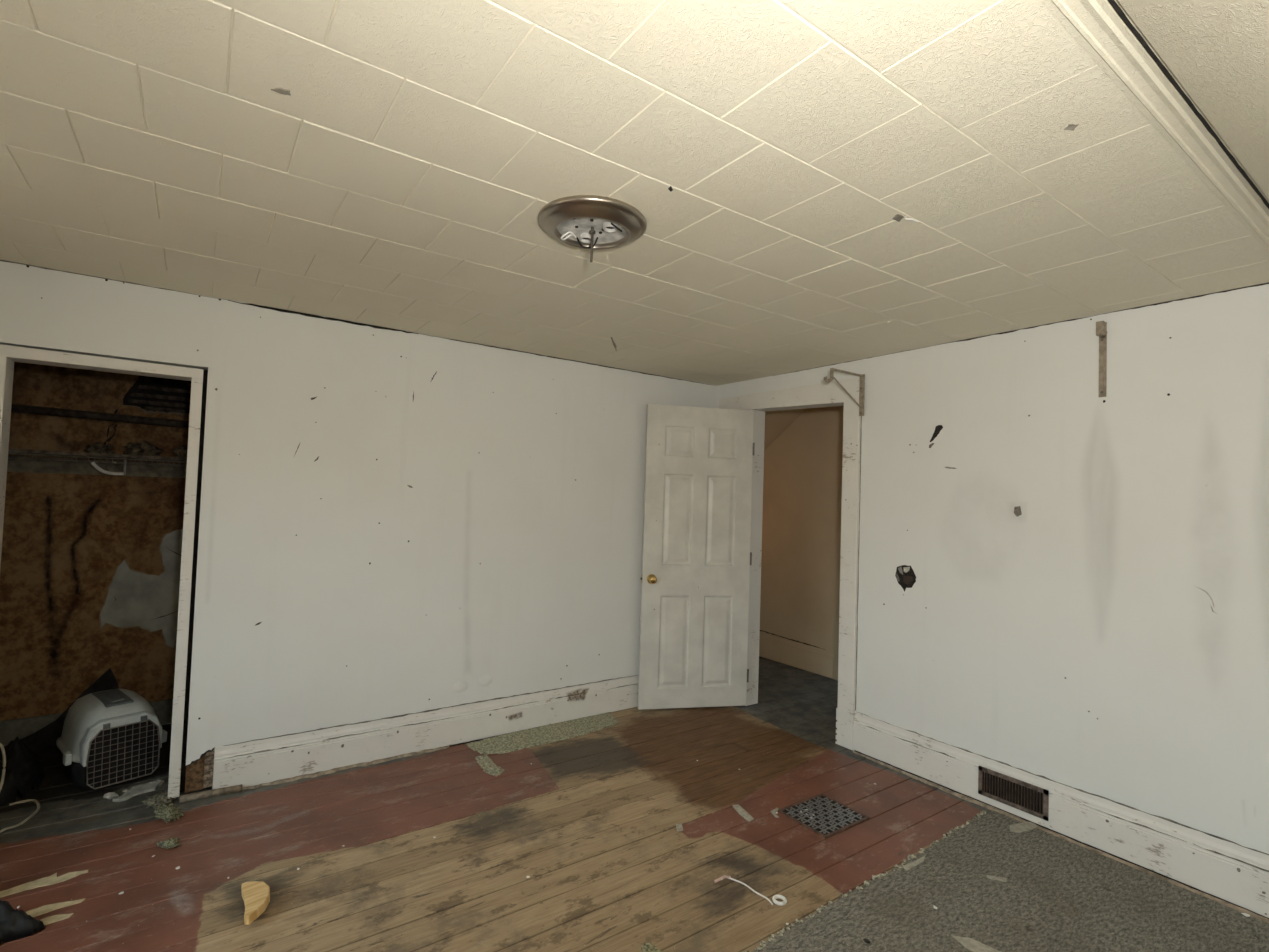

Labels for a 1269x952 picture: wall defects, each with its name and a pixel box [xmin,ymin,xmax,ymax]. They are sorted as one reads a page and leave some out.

crack [1108,0,1269,209]
crack [774,282,1269,376]
peeling [99,529,183,649]
flaking render [185,747,215,793]